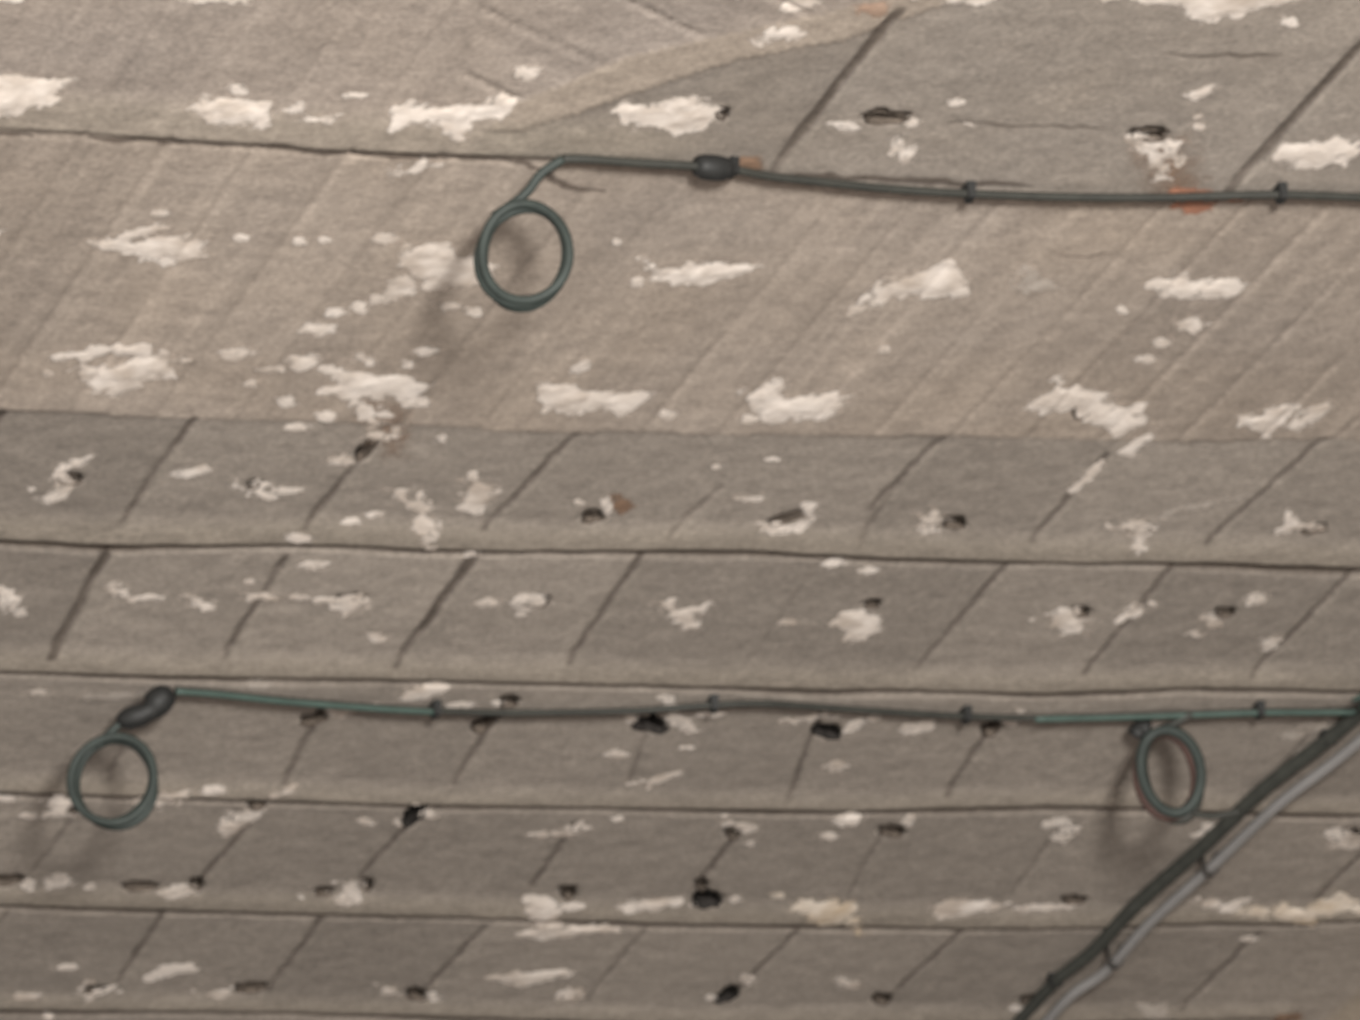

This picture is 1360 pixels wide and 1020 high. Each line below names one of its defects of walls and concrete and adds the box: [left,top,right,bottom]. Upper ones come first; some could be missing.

spalling [1132,0,1298,28]
spalling [514,65,542,82]
spalling [0,74,77,118]
spalling [387,92,523,143]
rust [1168,187,1242,214]
spalling [623,694,727,751]
spalling [778,711,882,740]
spalling [896,719,936,735]
spalling [625,770,685,790]
spalling [510,877,742,941]
spalling [52,963,123,1002]
spalling [12,992,54,1020]